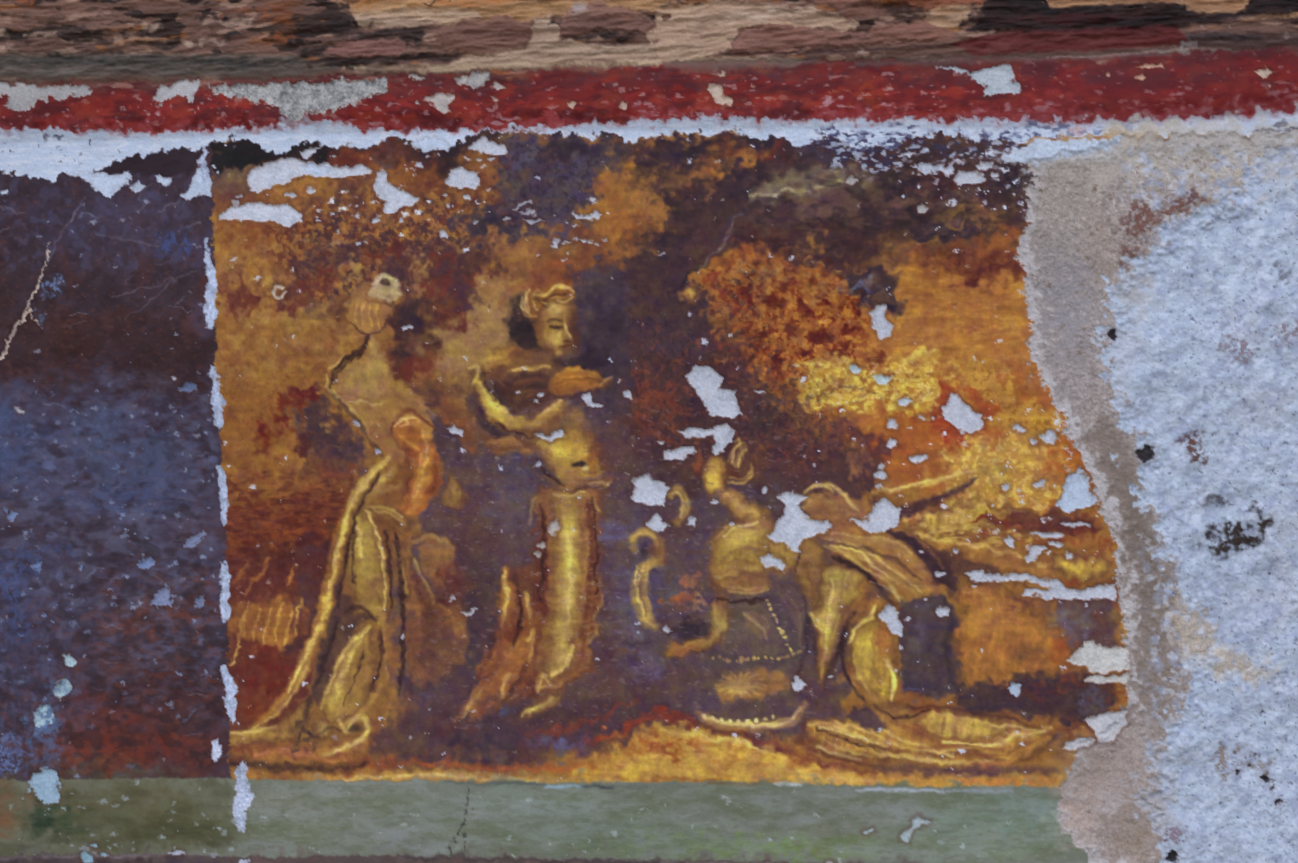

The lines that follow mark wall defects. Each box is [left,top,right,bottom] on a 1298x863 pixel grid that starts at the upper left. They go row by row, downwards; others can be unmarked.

peeling [932,62,1023,98]
peeling [0,68,1298,201]
peeling [217,191,303,228]
peeling [371,168,420,215]
peeling [442,164,482,210]
crack [0,241,52,361]
peeling [201,235,220,330]
peeling [656,363,767,462]
peeling [629,471,697,534]
peeling [758,363,986,573]
spalling [964,129,1298,863]
peeling [210,663,256,834]